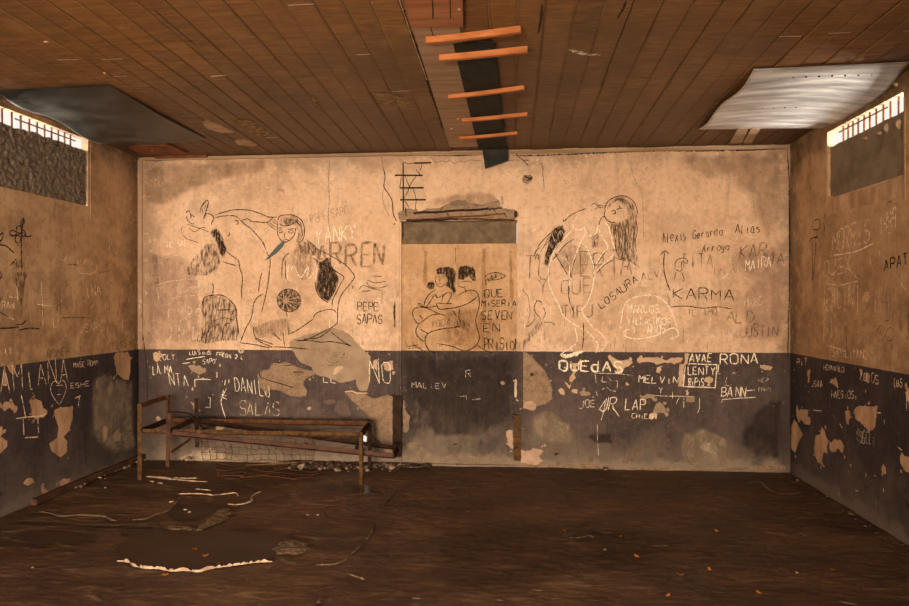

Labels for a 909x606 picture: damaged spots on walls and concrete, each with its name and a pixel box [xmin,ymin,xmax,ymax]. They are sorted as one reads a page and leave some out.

spalling [393,162,519,225]
peeling [113,352,132,380]
spalling [258,362,315,397]
peeling [371,359,395,375]
spalling [500,352,594,411]
peeling [608,353,695,402]
peeling [0,426,8,453]
peeling [29,393,73,459]
spalling [506,430,698,471]
peeling [640,394,669,420]
peeling [845,401,878,437]
peeling [900,453,909,473]